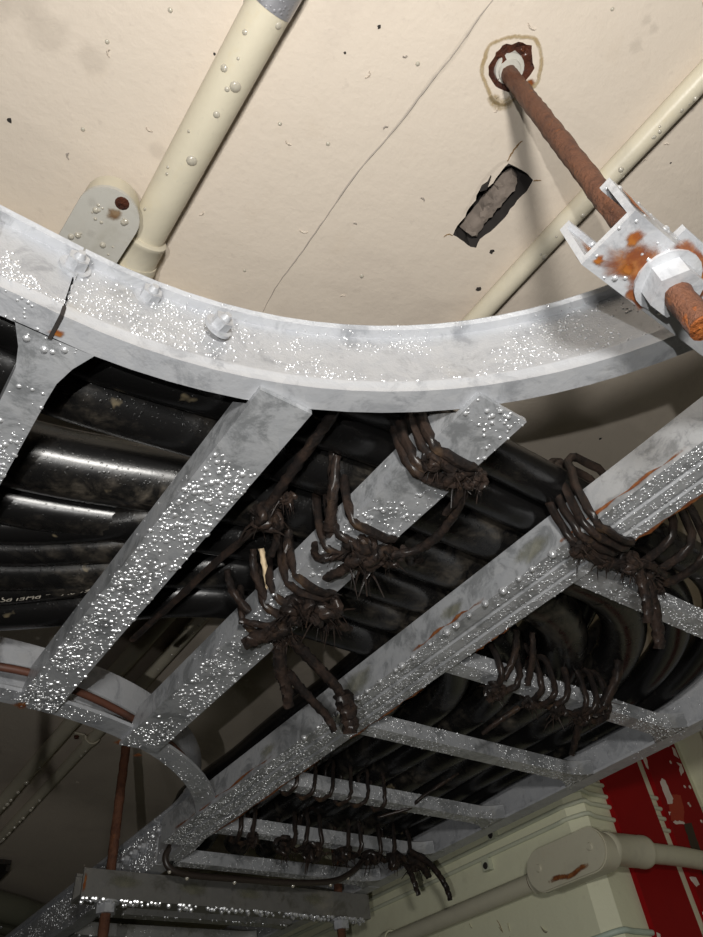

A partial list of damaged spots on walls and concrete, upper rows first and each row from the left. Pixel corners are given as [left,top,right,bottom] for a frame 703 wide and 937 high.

peeling [660,778,685,824]